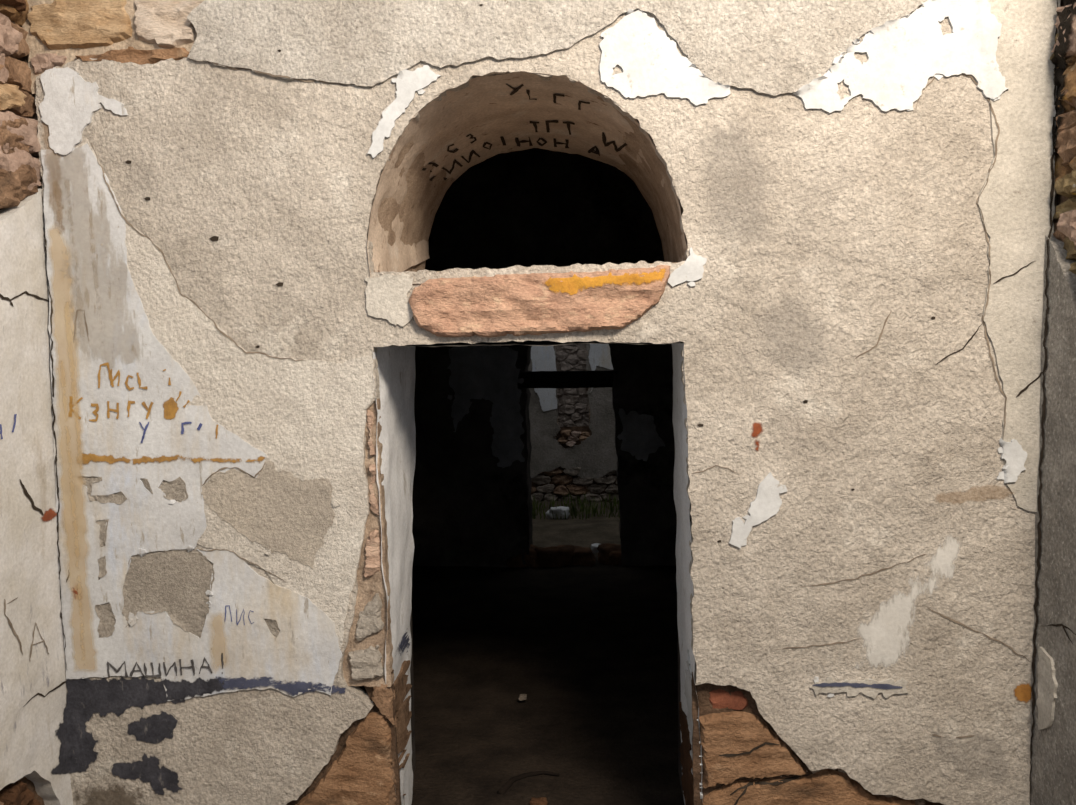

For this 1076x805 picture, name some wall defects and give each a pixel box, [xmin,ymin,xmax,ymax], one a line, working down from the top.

flaking render [0,0,204,210]
peeling [368,65,441,158]
peeling [599,9,731,106]
peeling [793,0,1010,114]
flaking render [1050,2,1076,274]
crack [0,196,70,707]
crack [855,312,891,359]
crack [927,0,1076,801]
peeling [51,398,412,805]
crack [718,742,780,757]
crack [730,775,802,805]
flaking render [679,649,944,805]